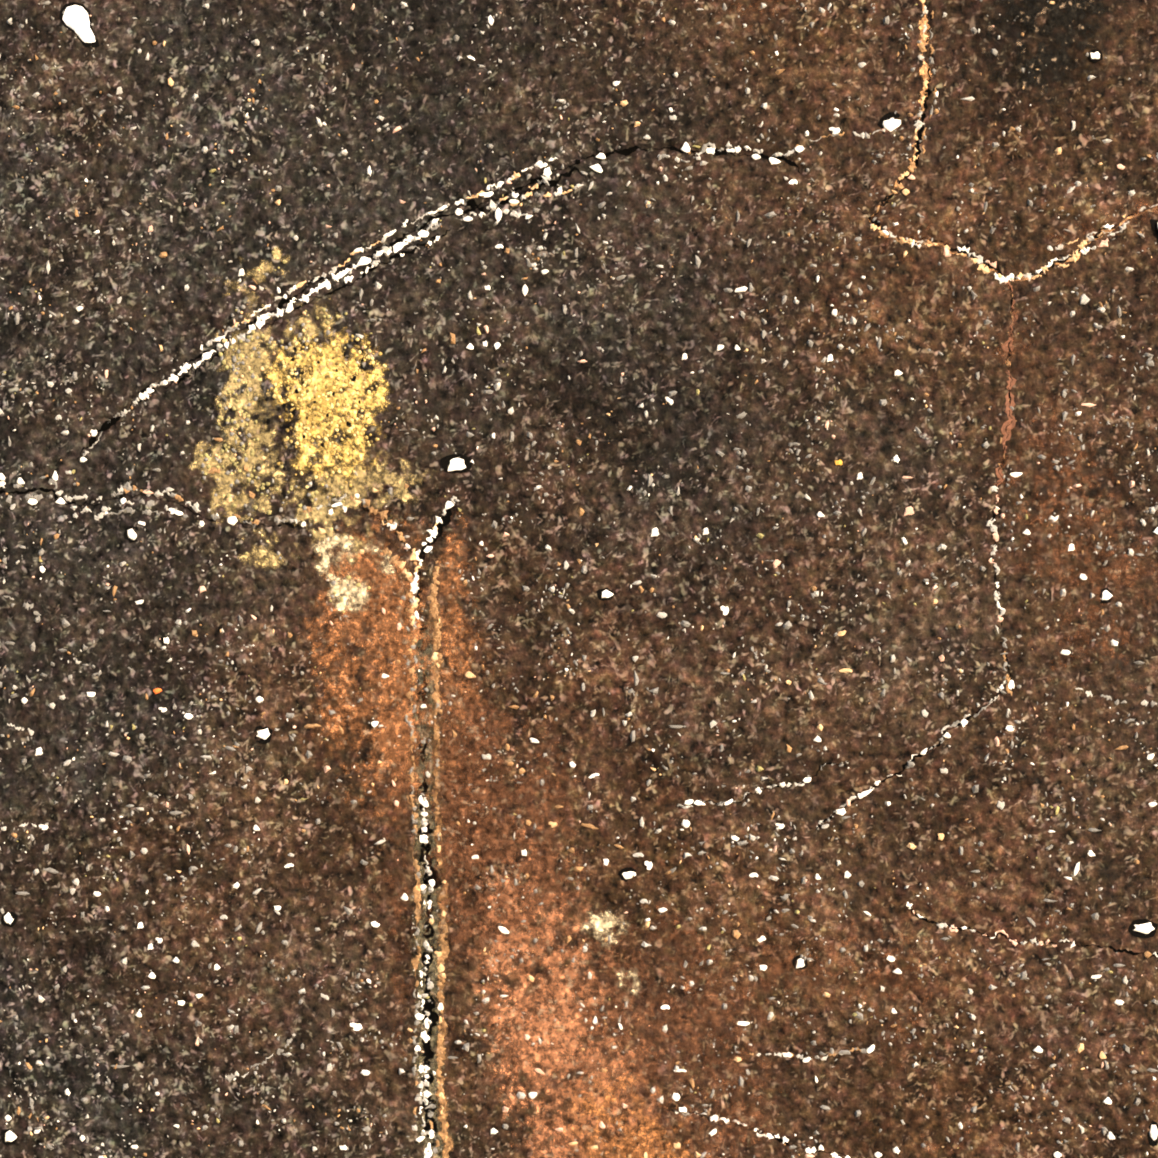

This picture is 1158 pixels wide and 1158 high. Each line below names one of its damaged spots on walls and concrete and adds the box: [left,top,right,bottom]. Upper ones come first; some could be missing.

crack [0,128,885,1158]
rust [308,525,909,1158]
crack [816,0,1158,830]